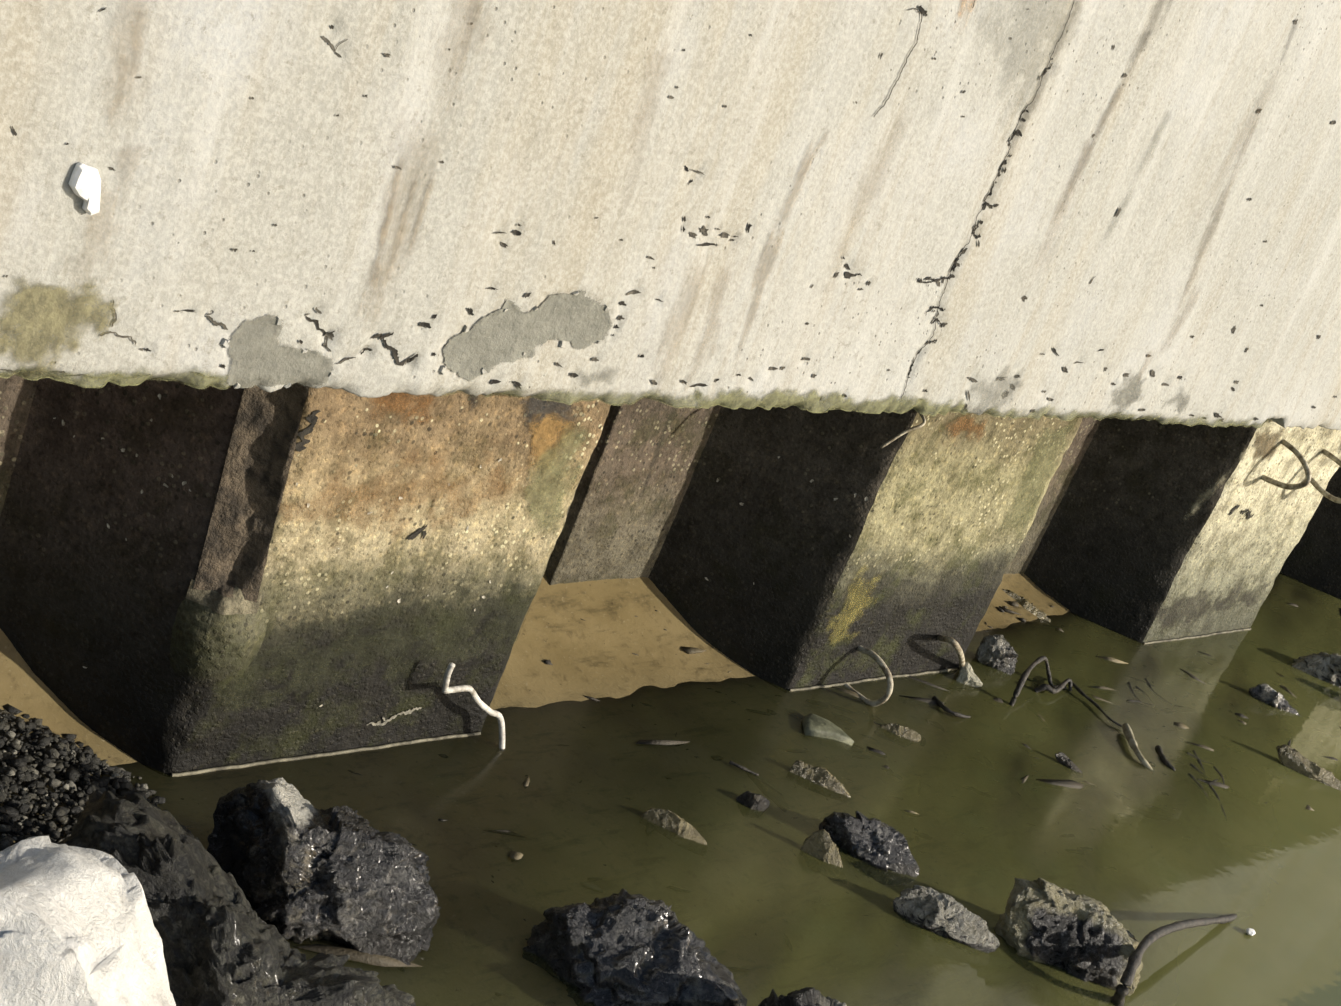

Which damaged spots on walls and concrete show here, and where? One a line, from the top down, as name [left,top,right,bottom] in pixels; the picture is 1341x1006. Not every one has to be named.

crack [874,5,927,117]
crack [901,2,1074,399]
crack [305,313,418,366]
peeling [439,290,613,381]
spalling [185,314,333,615]
water stain [367,707,422,726]